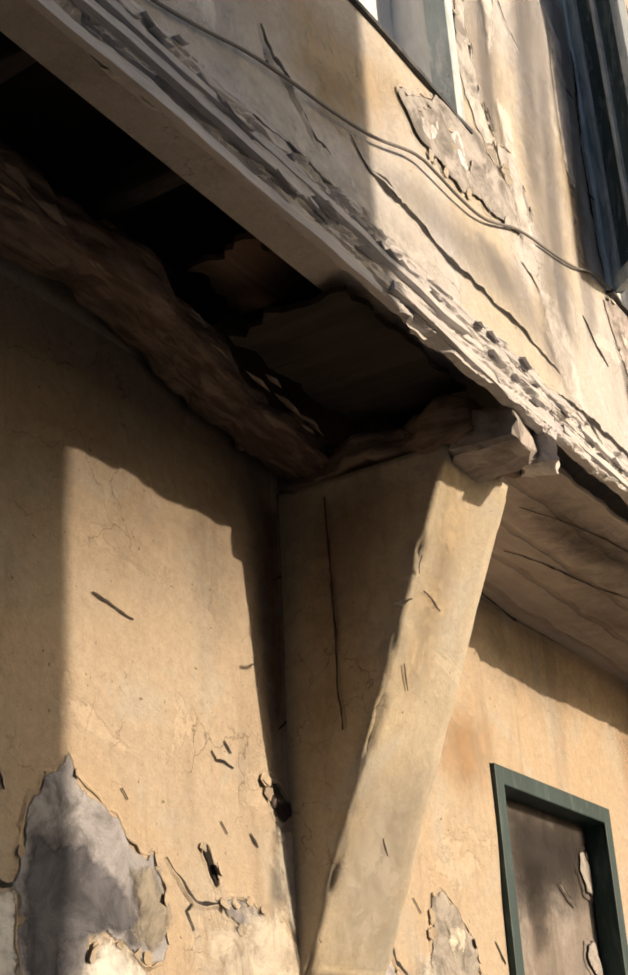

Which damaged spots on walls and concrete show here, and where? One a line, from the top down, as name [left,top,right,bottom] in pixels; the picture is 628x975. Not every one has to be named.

crack [253,23,333,191]
flaking render [391,0,534,246]
peeling [548,18,574,182]
crack [550,53,605,277]
crack [350,133,628,458]
flaking render [600,294,628,374]
crack [323,497,344,730]
flaking render [8,746,173,975]
crack [164,857,266,931]
flaking render [259,773,292,829]
flaking render [428,884,482,975]
damp [506,798,589,910]